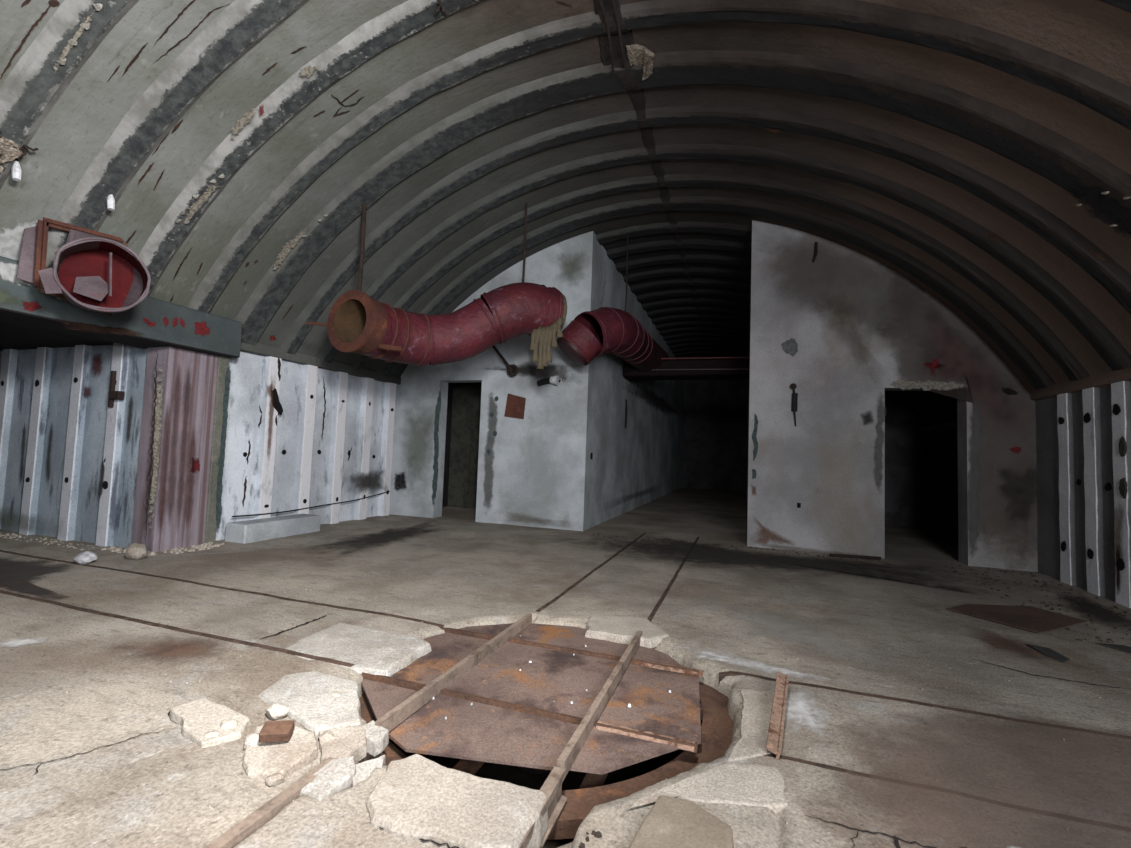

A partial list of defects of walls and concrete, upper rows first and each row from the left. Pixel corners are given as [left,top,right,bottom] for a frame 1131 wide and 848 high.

spalling [0,135,23,173]
damp [0,559,68,598]
rust [641,660,704,677]
rust [596,721,695,752]
crack [805,815,967,848]